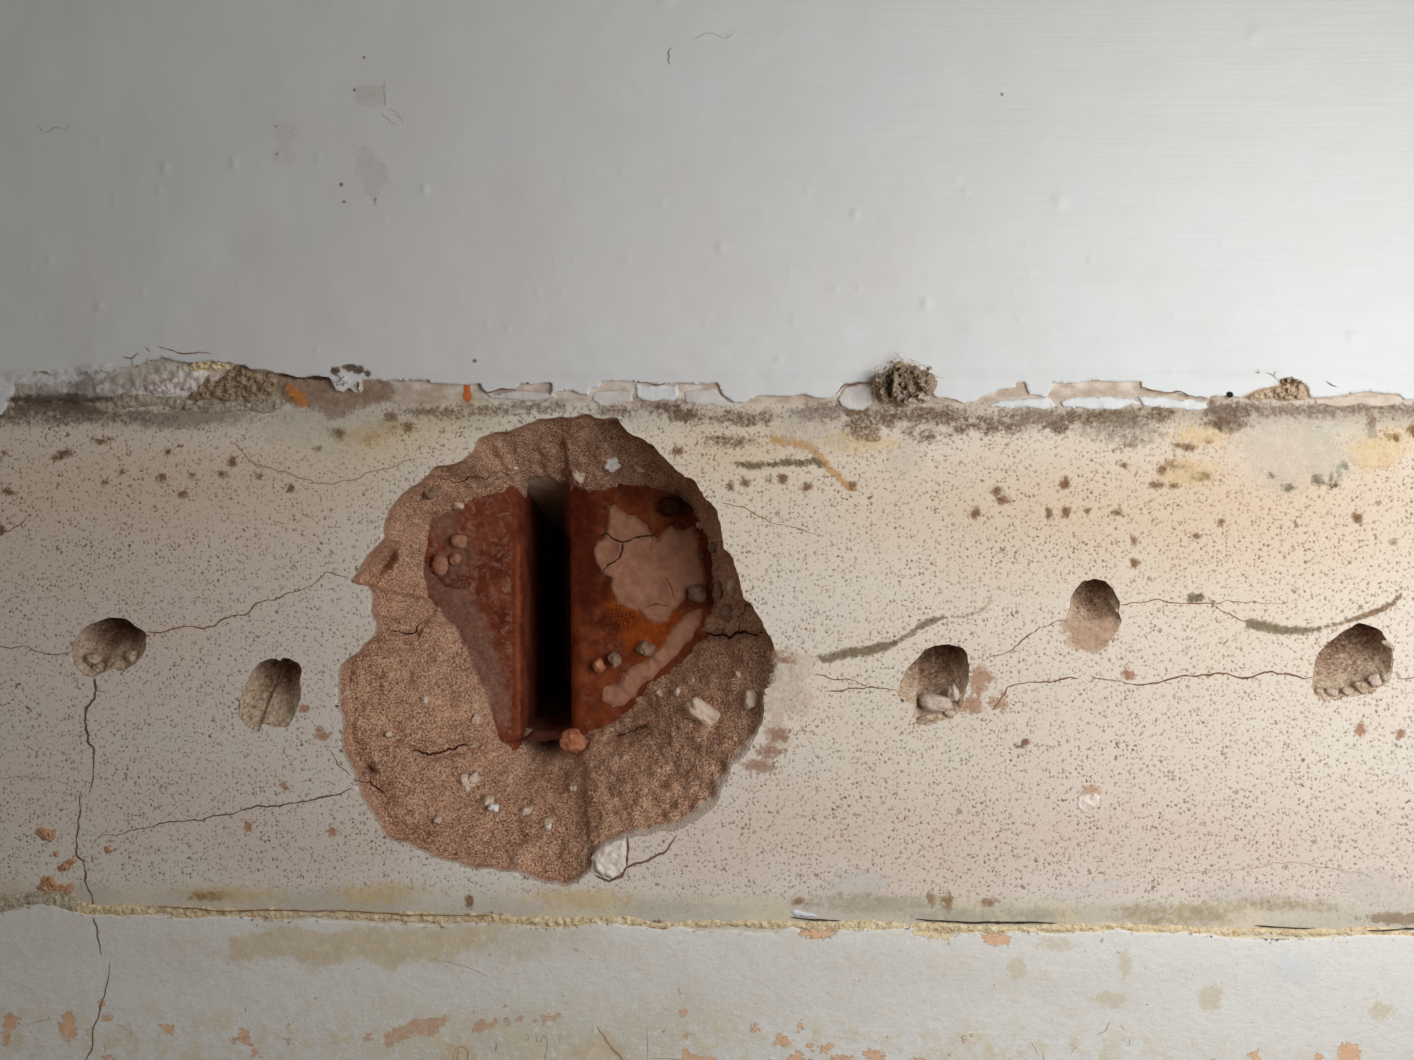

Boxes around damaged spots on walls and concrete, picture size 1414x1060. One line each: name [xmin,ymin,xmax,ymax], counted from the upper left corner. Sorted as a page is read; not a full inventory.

water stain [0,408,178,445]
peeling [13,358,285,417]
water stain [274,373,566,444]
water stain [590,399,857,491]
peeling [838,384,873,411]
peeling [987,396,1207,411]
water stain [791,400,1414,488]
crack [146,571,348,633]
spalling [338,384,778,887]
crack [990,620,1313,709]
crack [1122,599,1283,622]
crack [0,646,351,1059]